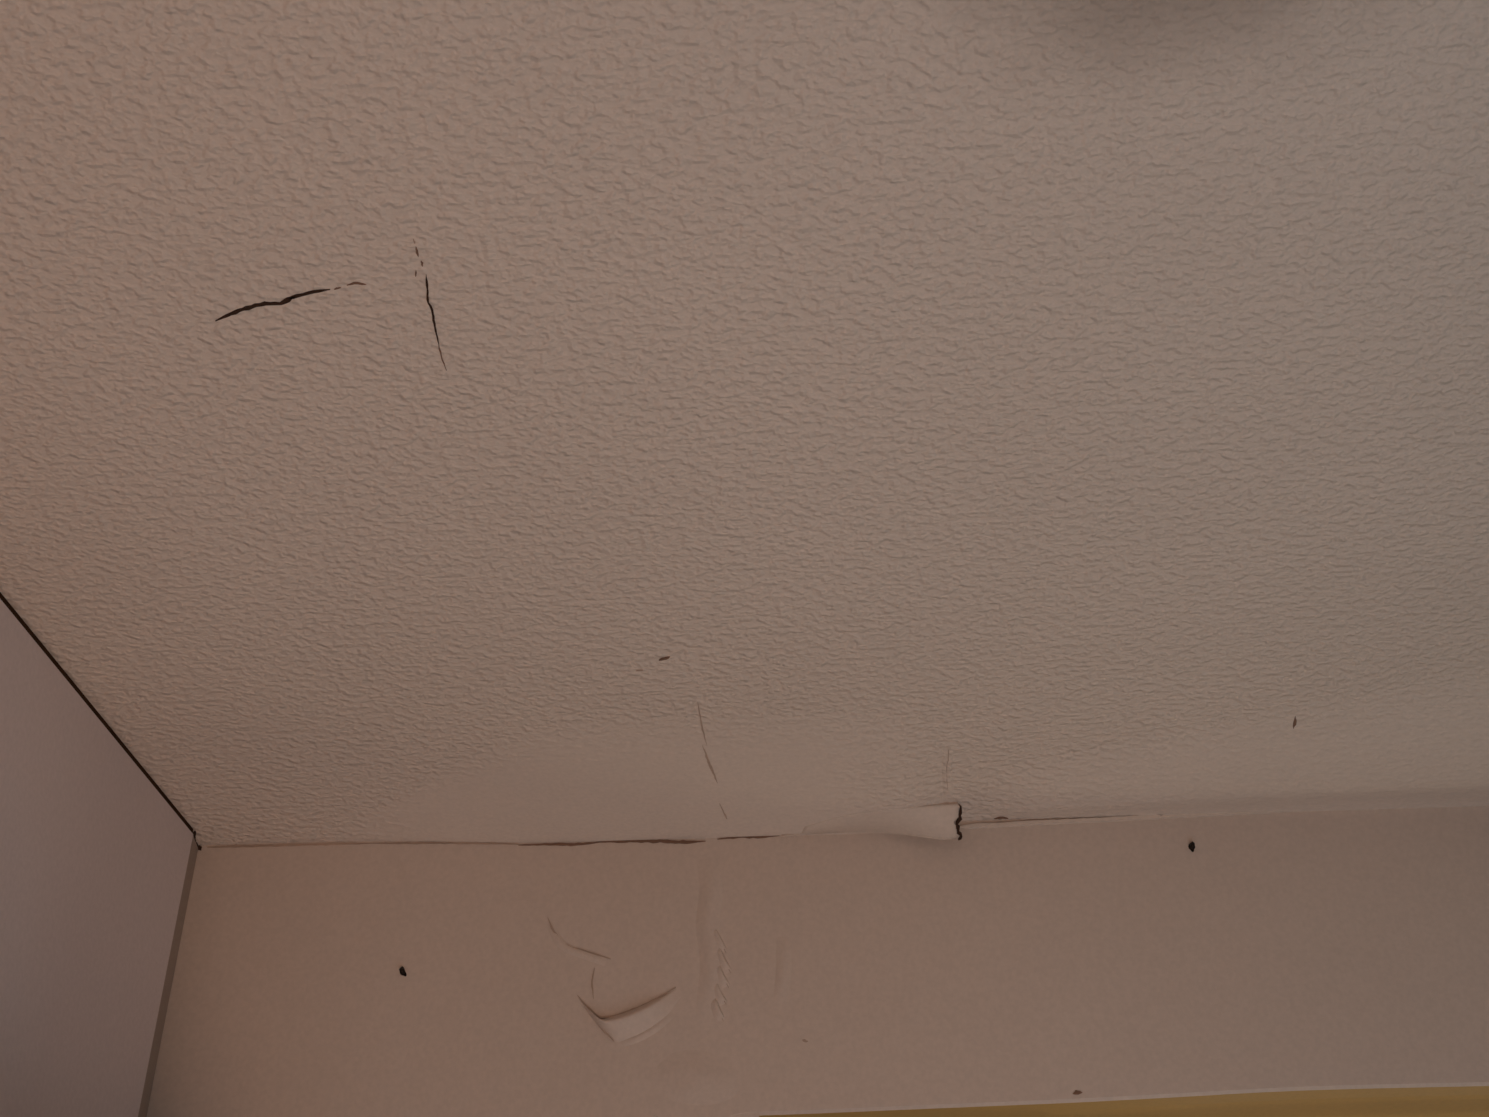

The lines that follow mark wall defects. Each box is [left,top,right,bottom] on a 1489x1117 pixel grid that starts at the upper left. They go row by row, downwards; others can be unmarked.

crack [215,282,366,321]
crack [413,238,447,371]
crack [207,705,780,848]